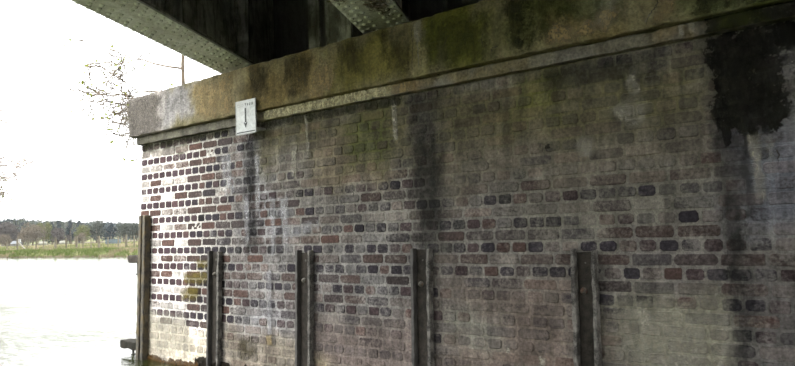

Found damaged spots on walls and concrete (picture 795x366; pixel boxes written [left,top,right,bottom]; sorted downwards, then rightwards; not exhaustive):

water stain [263,55,388,120]
water stain [702,0,795,179]